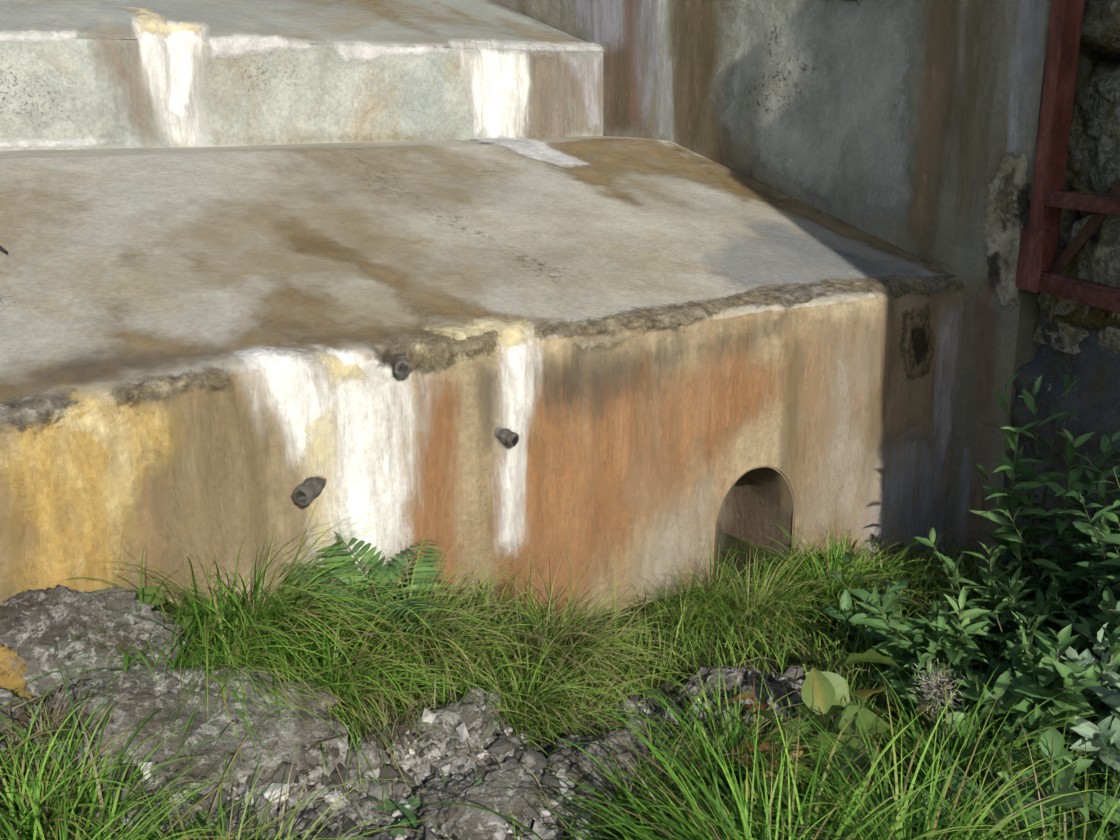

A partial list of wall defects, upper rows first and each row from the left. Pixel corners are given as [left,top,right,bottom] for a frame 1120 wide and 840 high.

leakage [103,7,204,147]
leakage [451,0,947,287]
spalling [982,153,1031,307]
spalling [0,388,78,432]
spalling [112,368,230,405]
leakage [0,199,541,592]
corrosion [400,385,456,586]
spalling [372,330,498,373]
corrosion [500,365,671,620]
spalling [526,274,965,379]